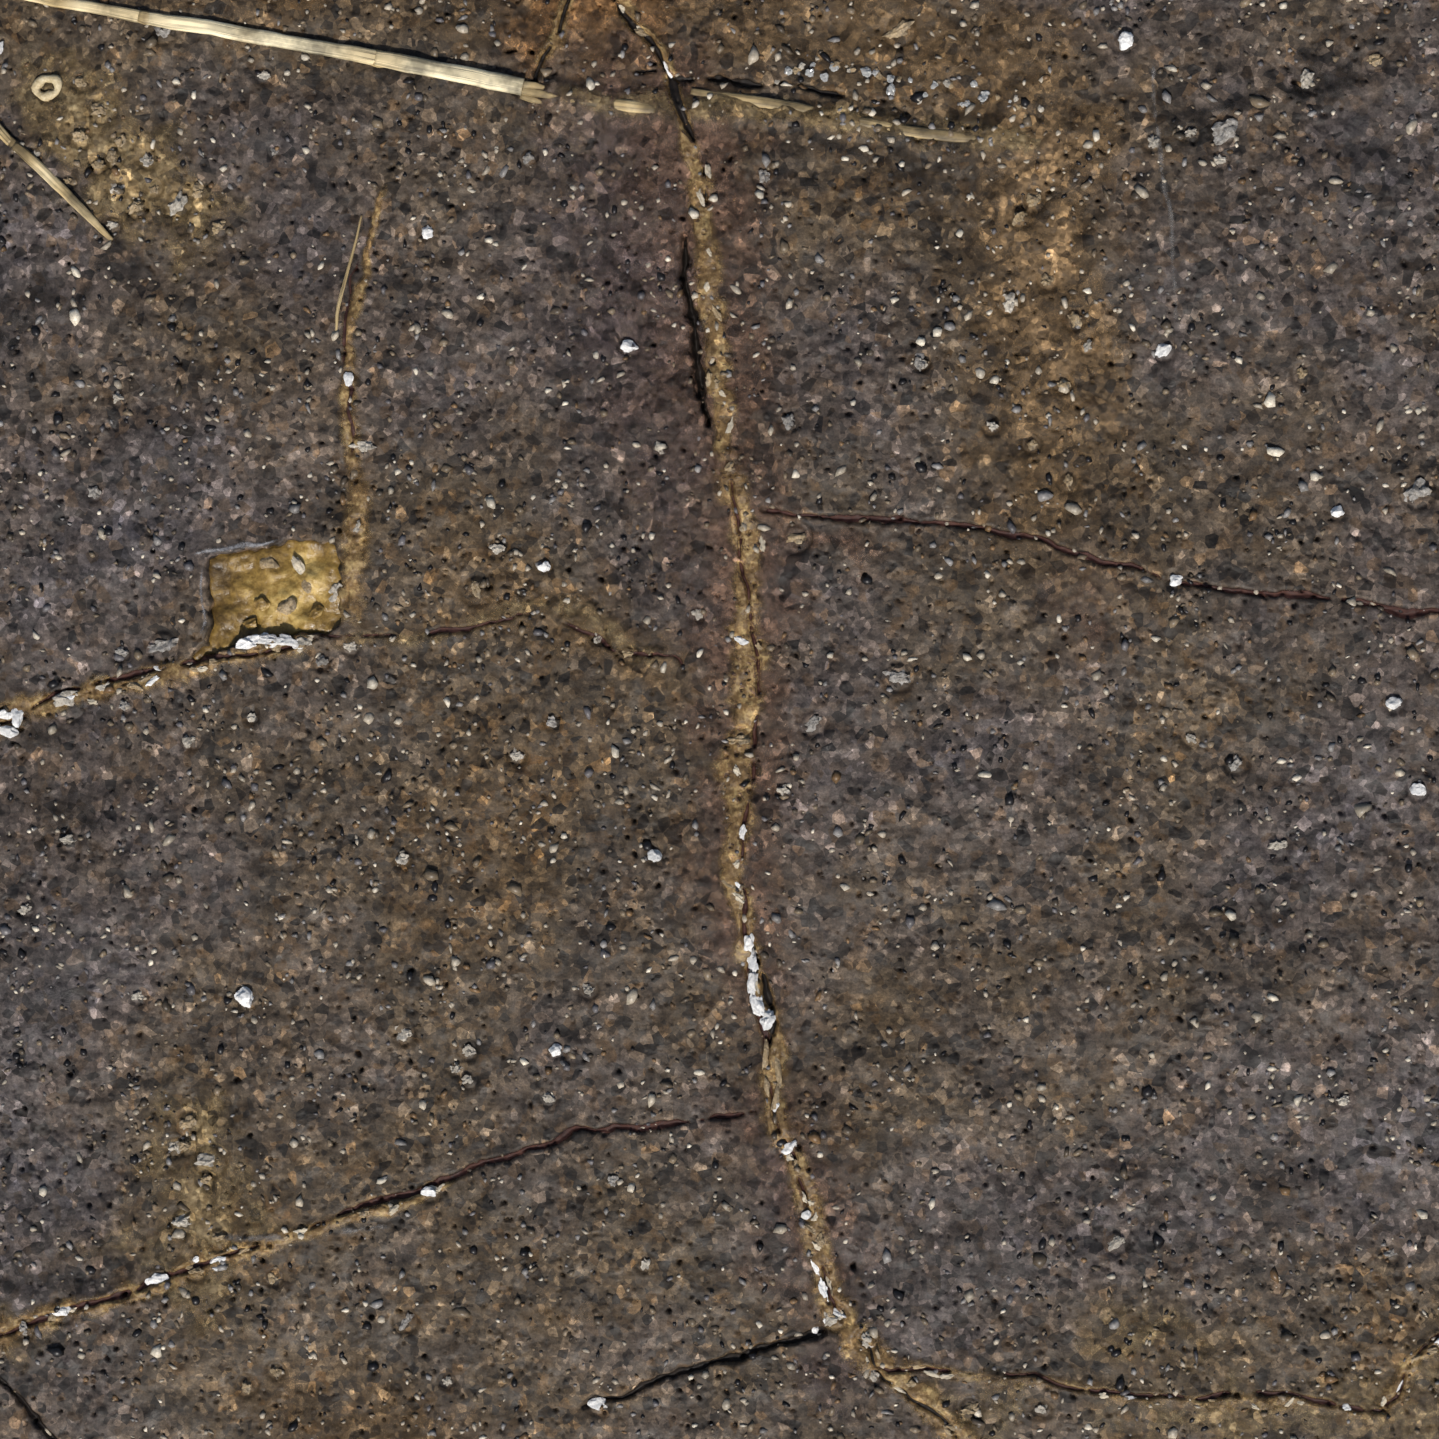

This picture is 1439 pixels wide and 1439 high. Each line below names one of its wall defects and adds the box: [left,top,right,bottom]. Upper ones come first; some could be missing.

crack [534,0,574,82]
spalling [193,540,343,661]
crack [0,601,683,736]
crack [604,0,1439,1439]
crack [0,1120,689,1348]
crack [0,1377,56,1439]